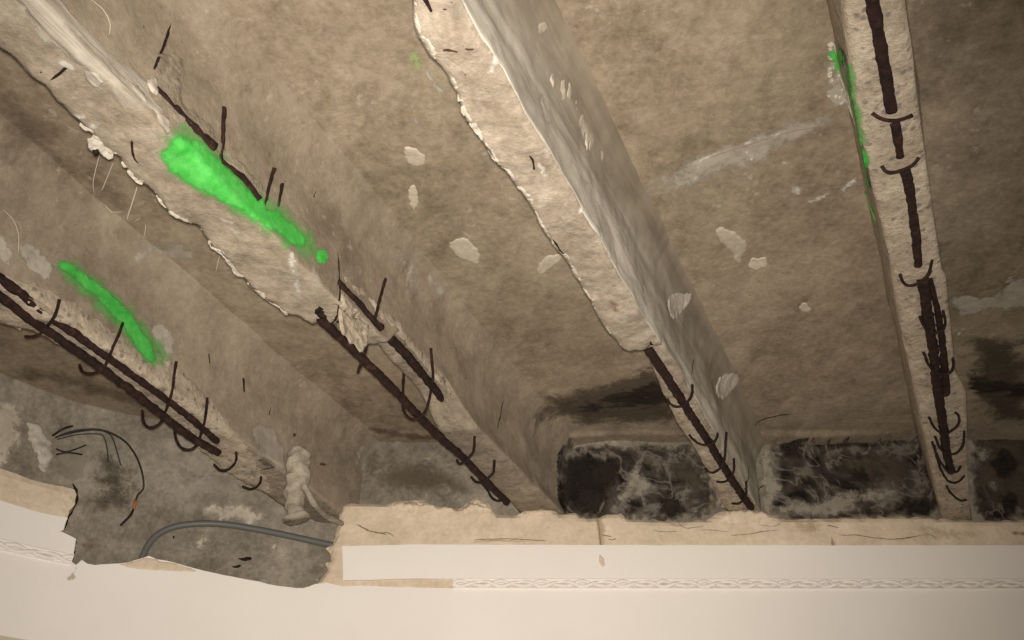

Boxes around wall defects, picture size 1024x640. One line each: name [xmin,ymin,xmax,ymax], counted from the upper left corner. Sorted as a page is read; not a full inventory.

spalling [414,0,437,59]
spalling [826,42,856,127]
spalling [426,70,621,345]
spalling [208,240,288,315]
spalling [865,0,967,502]
spalling [0,236,271,493]
water stain [535,374,673,424]
spalling [644,347,755,511]
water stain [556,437,716,522]
water stain [761,436,937,519]
water stain [973,439,1024,521]
peeling [120,557,196,572]